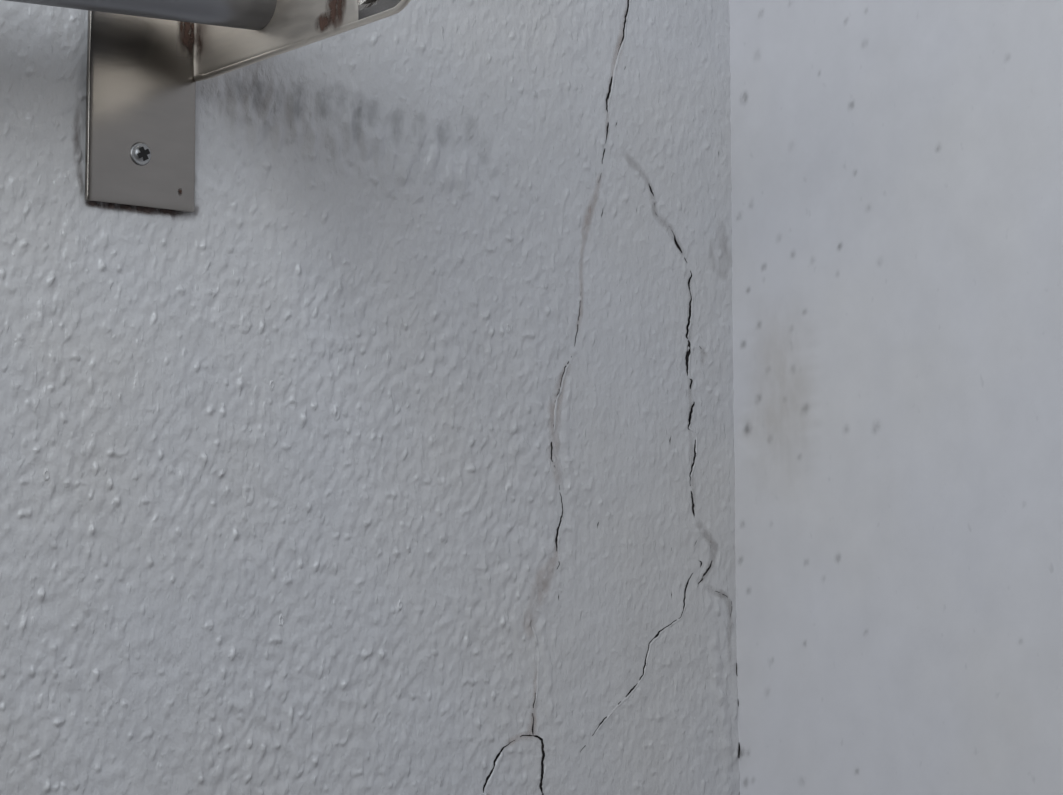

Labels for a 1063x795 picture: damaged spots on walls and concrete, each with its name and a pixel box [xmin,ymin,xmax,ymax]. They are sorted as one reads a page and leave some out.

crack [600,0,632,177]
crack [551,309,580,569]
crack [580,185,732,752]
crack [483,624,548,795]